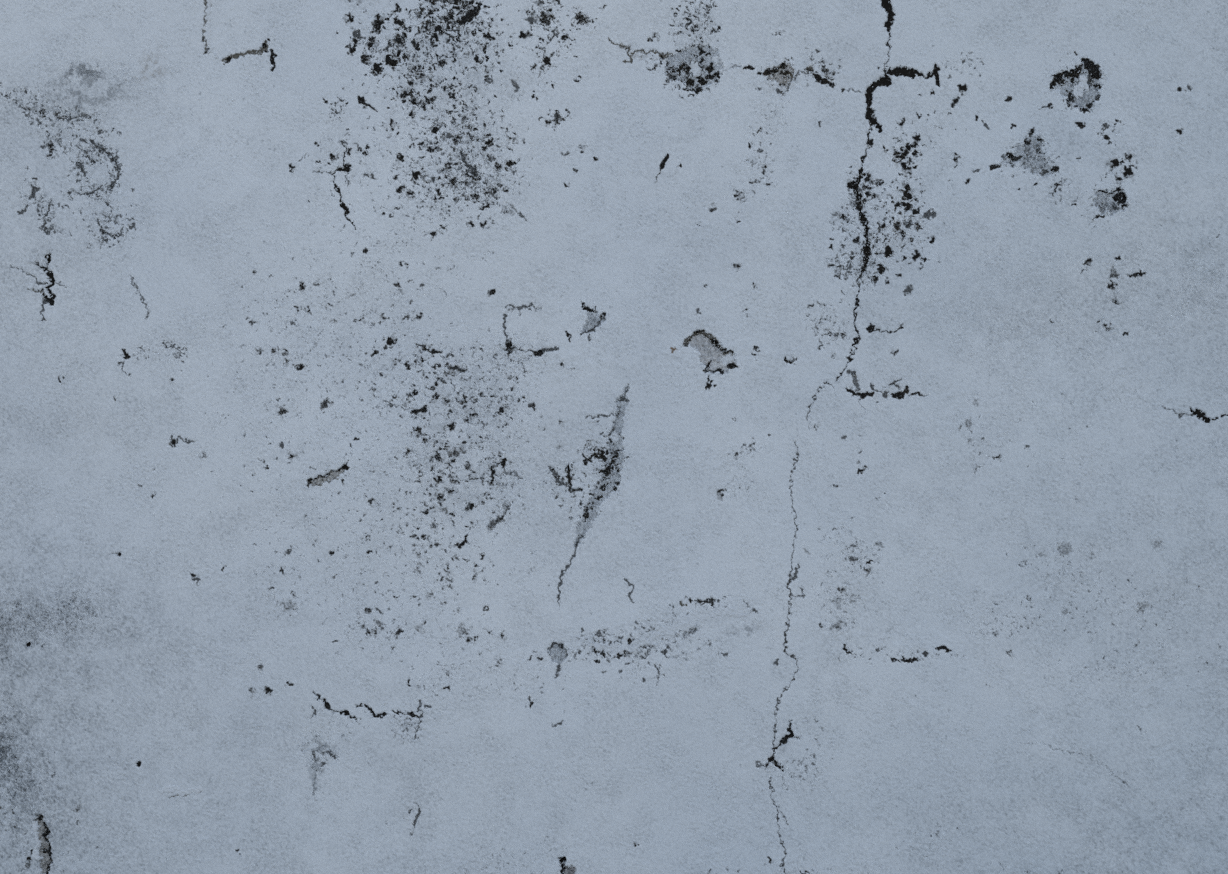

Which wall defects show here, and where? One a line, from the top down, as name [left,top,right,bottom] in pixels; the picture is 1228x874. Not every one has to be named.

spalling [965,52,1137,227]
spalling [671,329,738,389]
crack [756,0,941,874]
crack [1164,408,1228,423]
crack [311,692,431,743]
spalling [25,815,53,874]